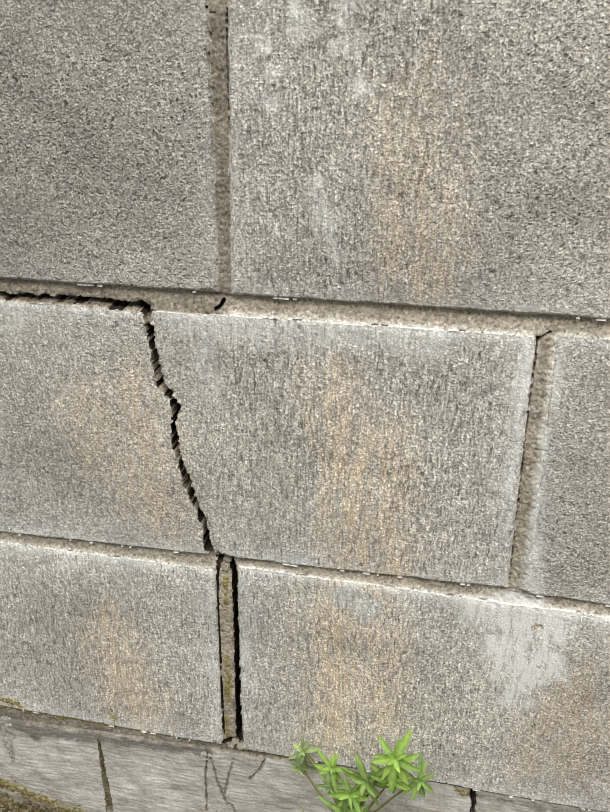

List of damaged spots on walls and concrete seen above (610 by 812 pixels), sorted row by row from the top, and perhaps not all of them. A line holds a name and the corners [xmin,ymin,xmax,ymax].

crack [0,291,268,812]
crack [469,788,477,812]